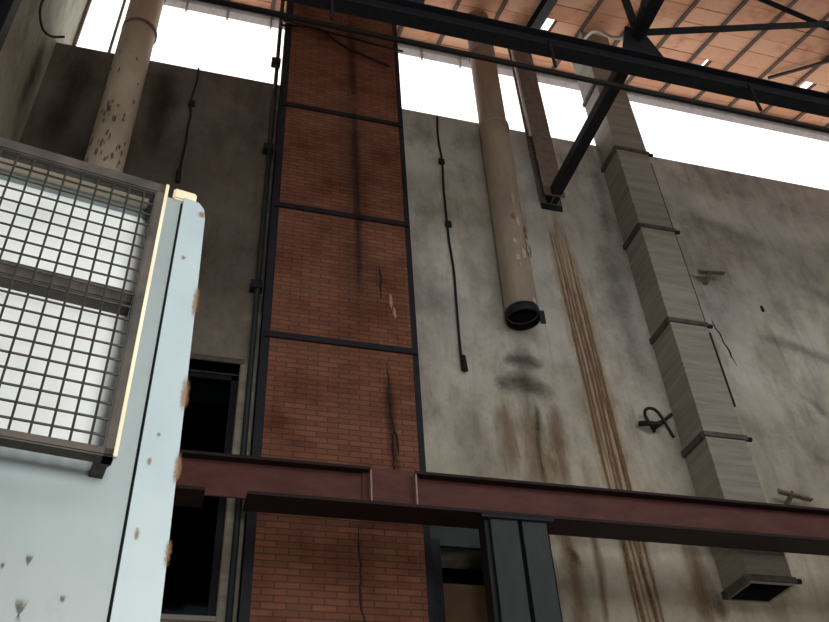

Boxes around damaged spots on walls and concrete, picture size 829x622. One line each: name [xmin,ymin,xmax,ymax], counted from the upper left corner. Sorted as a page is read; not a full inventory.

rust [553,227,632,491]
crack [386,360,399,470]
rust [620,540,661,622]